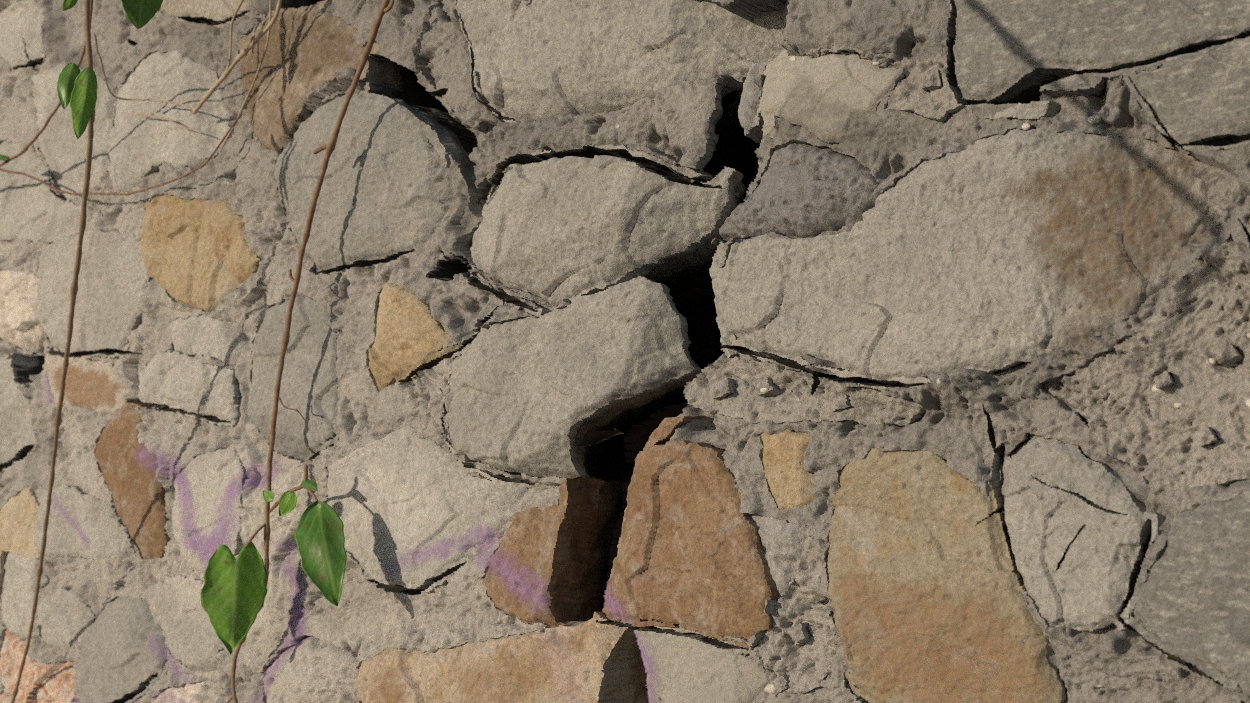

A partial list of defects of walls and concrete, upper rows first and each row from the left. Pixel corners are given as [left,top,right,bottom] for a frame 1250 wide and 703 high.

crack [947,14,1250,156]
crack [669,273,715,306]
crack [576,402,749,650]